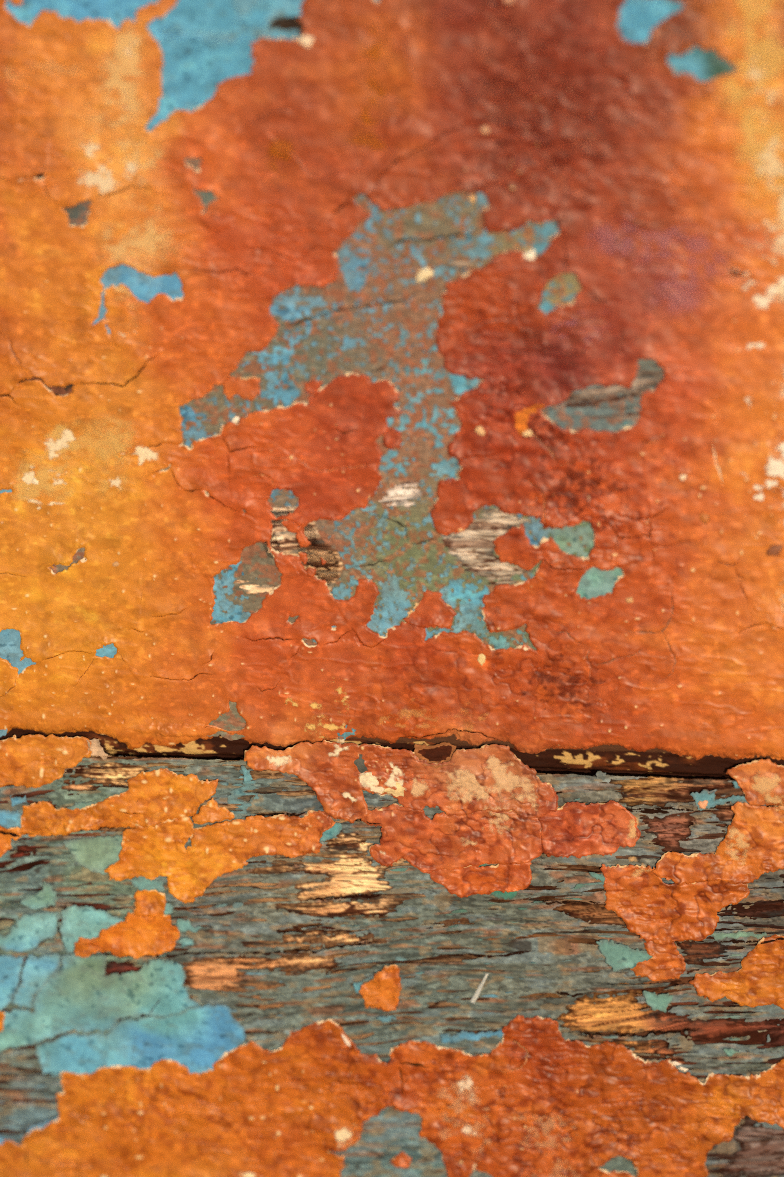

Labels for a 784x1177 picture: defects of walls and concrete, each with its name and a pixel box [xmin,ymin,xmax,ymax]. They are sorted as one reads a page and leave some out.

peeling [616,0,685,44]
peeling [4,0,304,132]
peeling [93,264,183,335]
peeling [179,188,623,650]
peeling [515,359,665,435]
crack [595,506,670,562]
crack [712,558,784,632]
peeling [0,629,36,675]
crack [554,587,676,680]
peeling [0,701,784,1145]
peeling [329,1106,448,1177]
peeling [705,1115,784,1177]